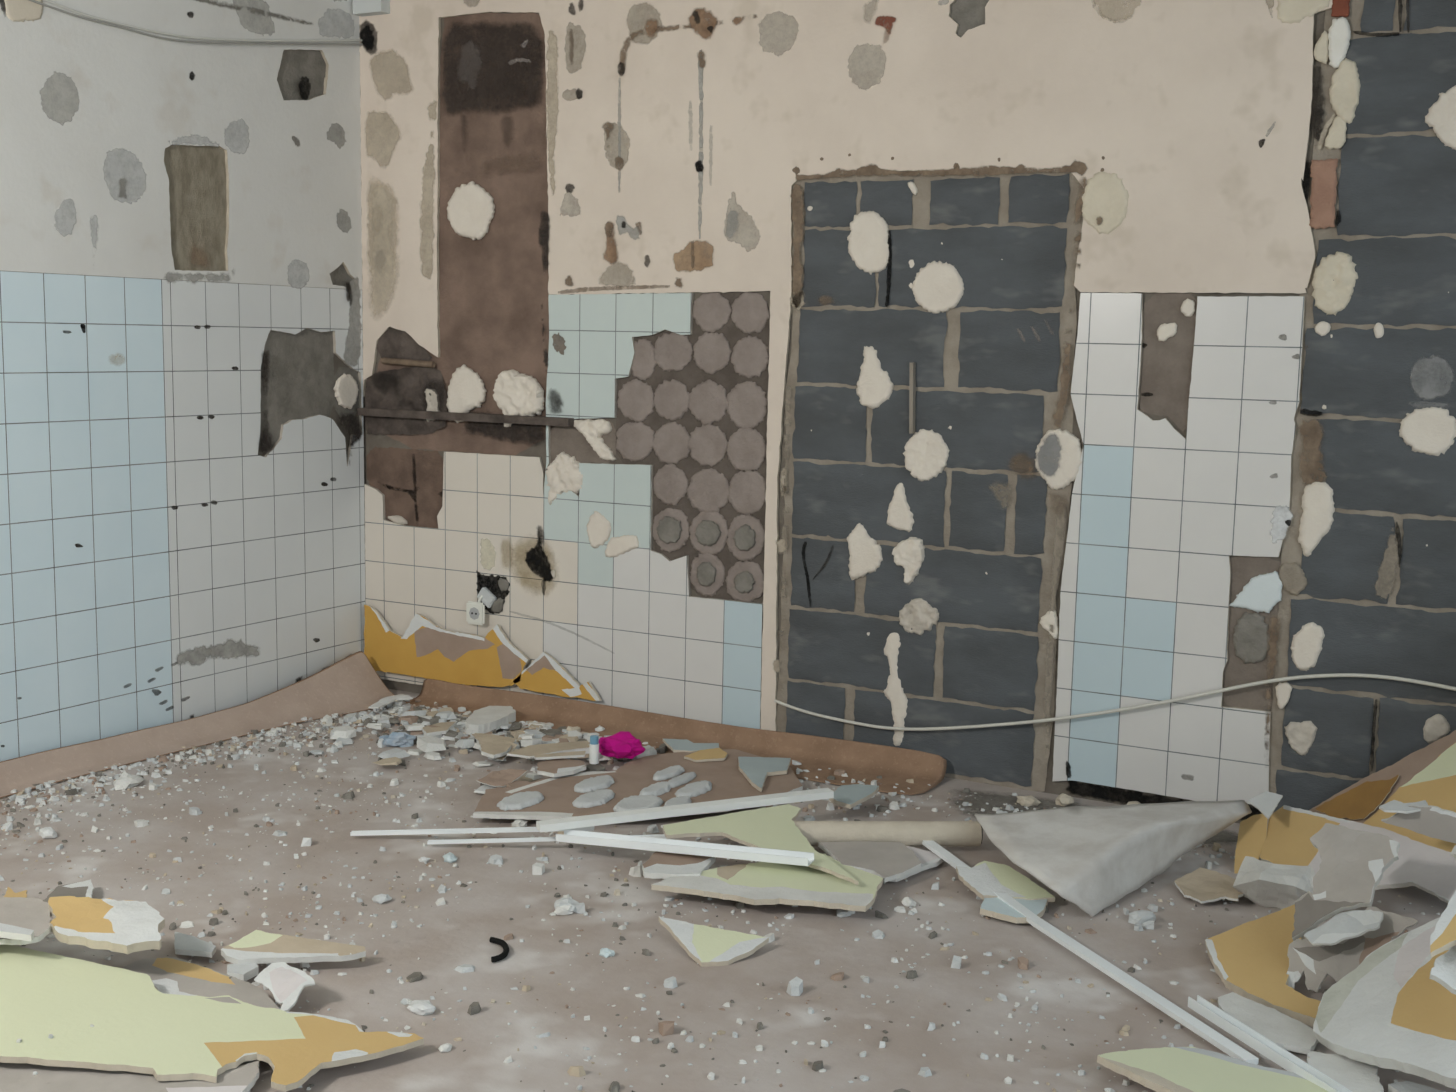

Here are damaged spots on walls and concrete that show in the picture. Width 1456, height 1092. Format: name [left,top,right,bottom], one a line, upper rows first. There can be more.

flaking render [40,72,79,125]
peeling [164,119,250,283]
flaking render [277,0,377,100]
flaking render [562,0,586,101]
flaking render [603,123,630,170]
flaking render [724,192,760,251]
peeling [791,153,1105,310]
flaking render [1302,158,1341,229]
flaking render [1311,0,1351,140]
peeling [258,260,447,528]
peeling [545,292,791,602]
peeling [1139,292,1197,432]